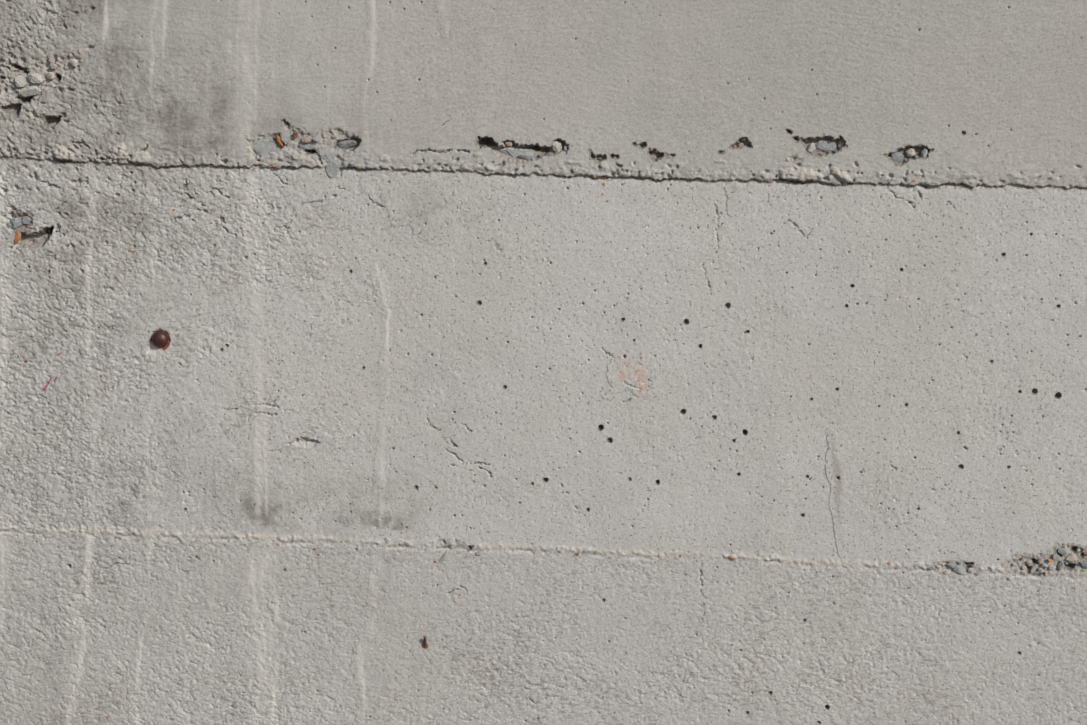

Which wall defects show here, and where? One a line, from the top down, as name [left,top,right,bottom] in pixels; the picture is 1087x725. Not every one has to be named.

spalling [0,49,83,127]
leakage [29,0,272,157]
spalling [243,118,361,180]
leakage [359,0,382,159]
spalling [475,135,570,164]
spalling [785,129,848,162]
spalling [883,144,935,166]
leakage [0,162,23,459]
leakage [53,164,211,725]
leakage [214,170,299,725]
leakage [320,260,427,725]
spalling [1001,542,1087,589]